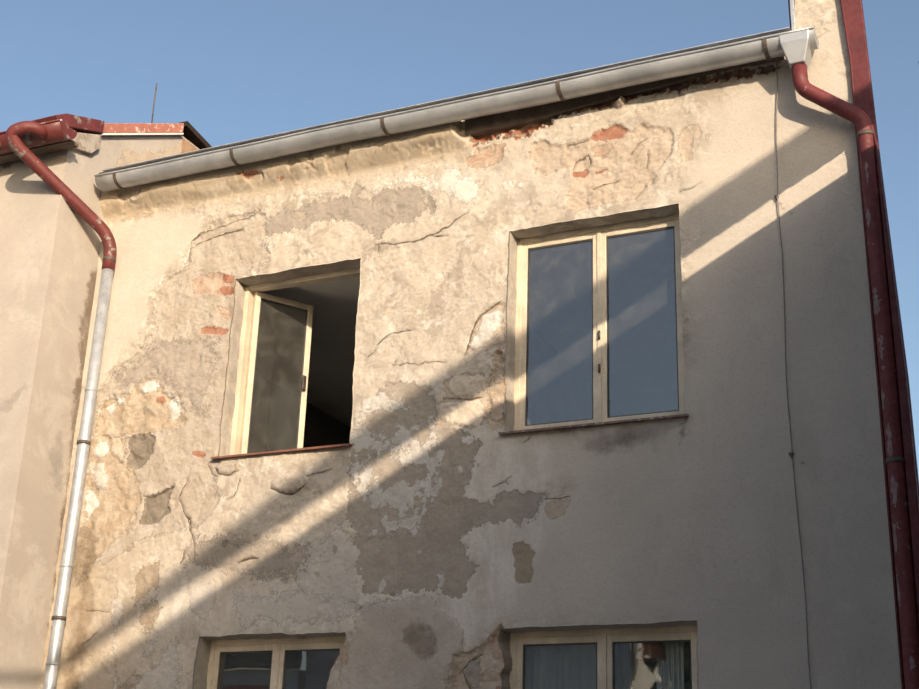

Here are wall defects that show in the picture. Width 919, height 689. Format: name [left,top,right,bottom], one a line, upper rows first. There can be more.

crack [189,209,261,257]
crack [375,213,467,254]
crack [368,329,447,365]
flaking render [79,65,783,634]
crack [178,475,195,564]
flaking render [450,624,504,689]